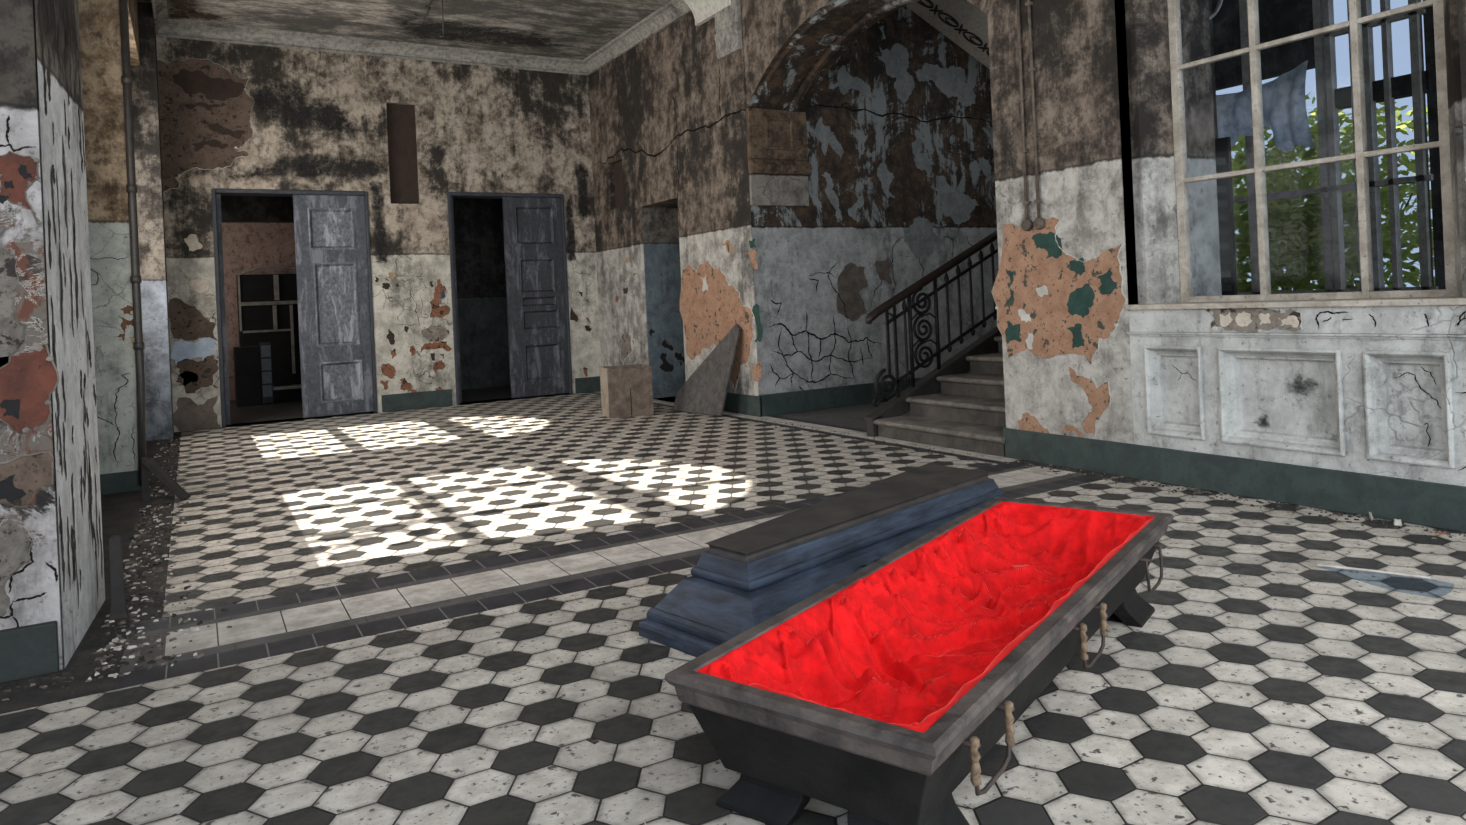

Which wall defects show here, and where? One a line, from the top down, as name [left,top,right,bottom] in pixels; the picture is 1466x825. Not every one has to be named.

leakage [389,17,558,47]
peeling [880,26,976,107]
crack [0,116,32,152]
peeling [0,0,105,667]
spalling [168,278,221,432]
peeling [380,279,452,393]
peeling [620,238,763,391]
crack [768,236,972,390]
peeling [991,217,1127,438]
crack [1315,311,1376,330]
crack [1395,367,1466,446]
crack [1424,311,1466,326]